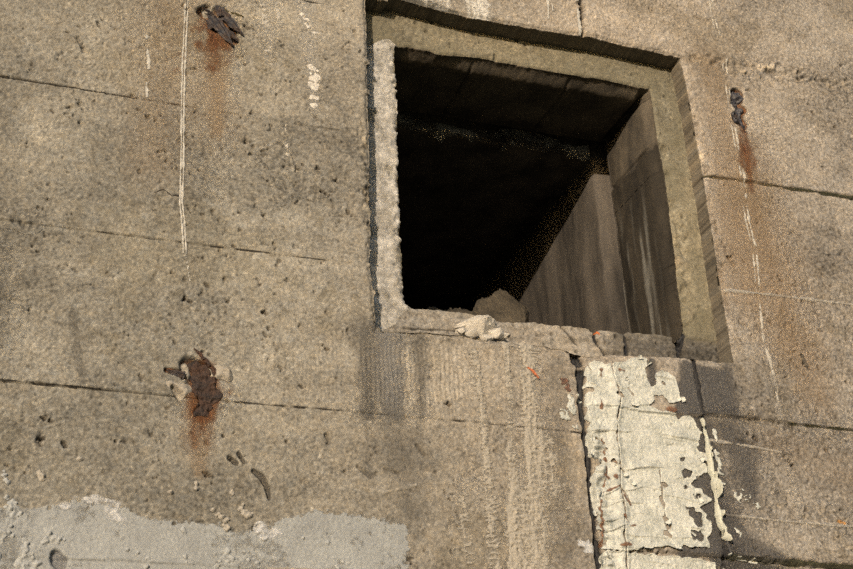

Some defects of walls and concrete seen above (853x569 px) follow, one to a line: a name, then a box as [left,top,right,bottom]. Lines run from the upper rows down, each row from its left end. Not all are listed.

rust [740,127,755,174]
peeling [560,355,724,569]